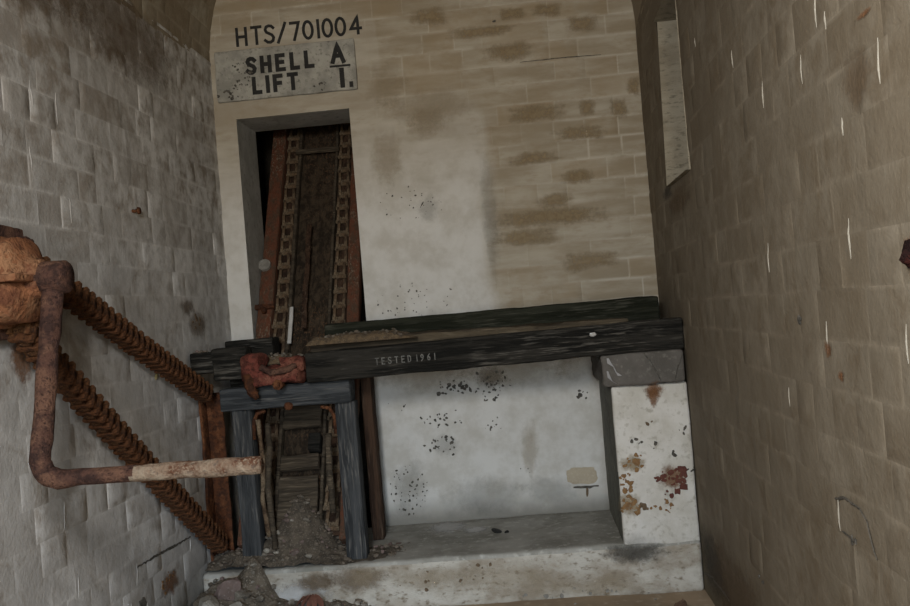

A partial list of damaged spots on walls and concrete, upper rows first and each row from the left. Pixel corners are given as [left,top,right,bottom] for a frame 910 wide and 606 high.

rust [12,344,31,382]
rust [647,383,662,405]
crack [834,496,878,560]